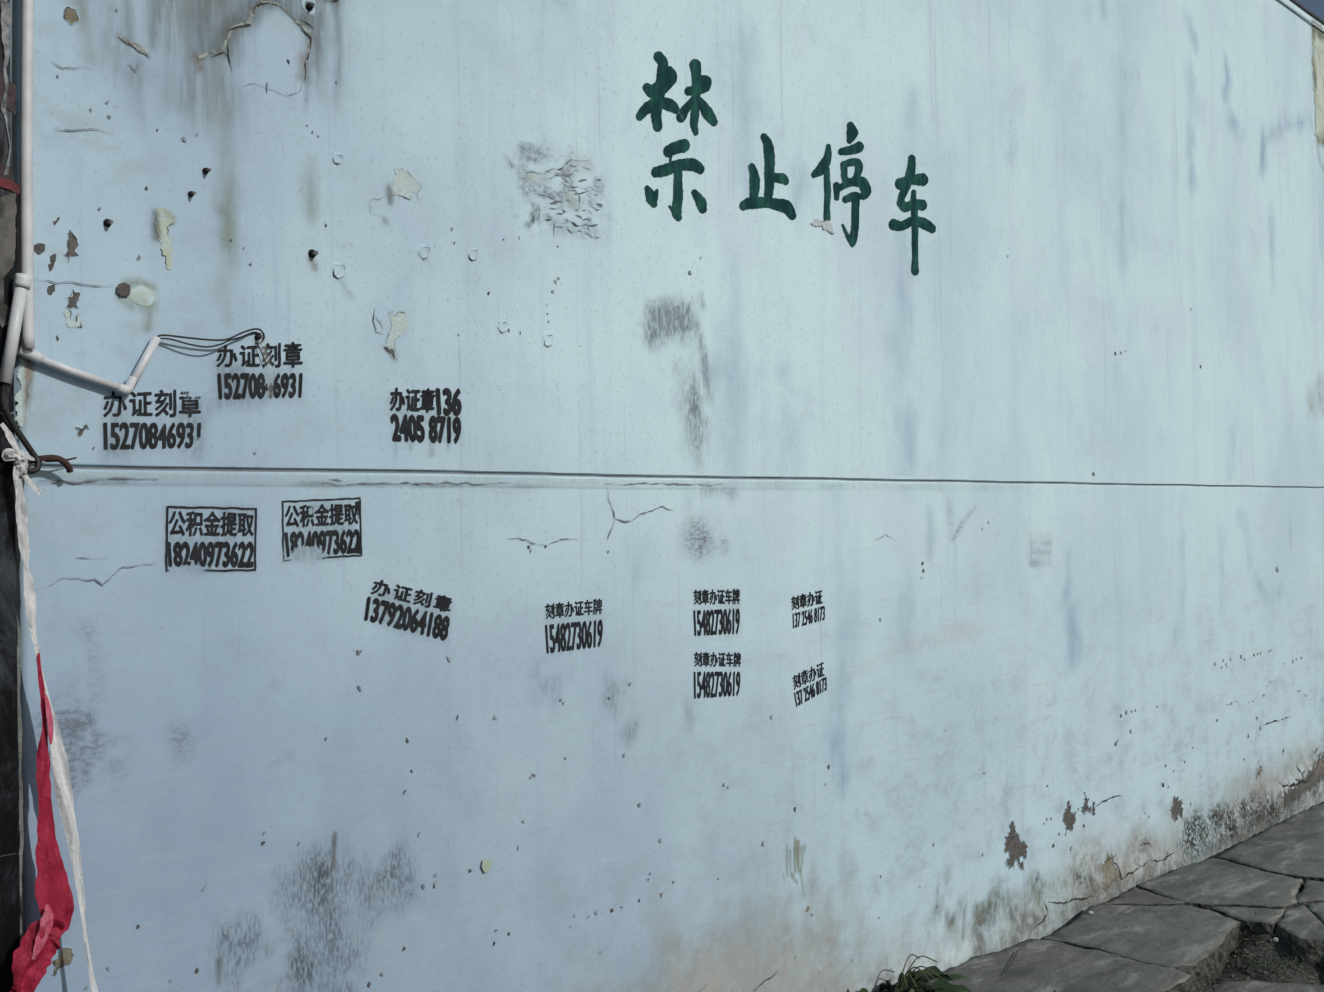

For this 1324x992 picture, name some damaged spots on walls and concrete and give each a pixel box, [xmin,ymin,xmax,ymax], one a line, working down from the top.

peeling [62,6,80,26]
peeling [195,0,314,96]
peeling [1312,21,1324,145]
peeling [525,157,603,248]
peeling [34,217,83,340]
crack [607,482,723,538]
crack [49,557,149,586]
peeling [1004,820,1040,881]
peeling [1044,791,1096,851]
peeling [1160,782,1192,823]
water stain [1179,794,1293,857]
water stain [976,875,1041,951]